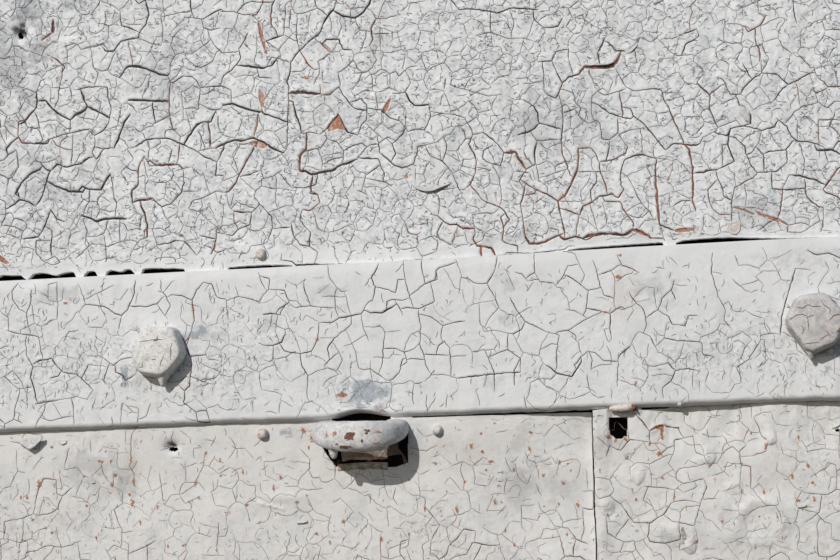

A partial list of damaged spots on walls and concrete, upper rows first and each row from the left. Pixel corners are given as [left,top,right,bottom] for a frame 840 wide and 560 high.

peeling [328,115,345,131]
crack [92,390,151,454]